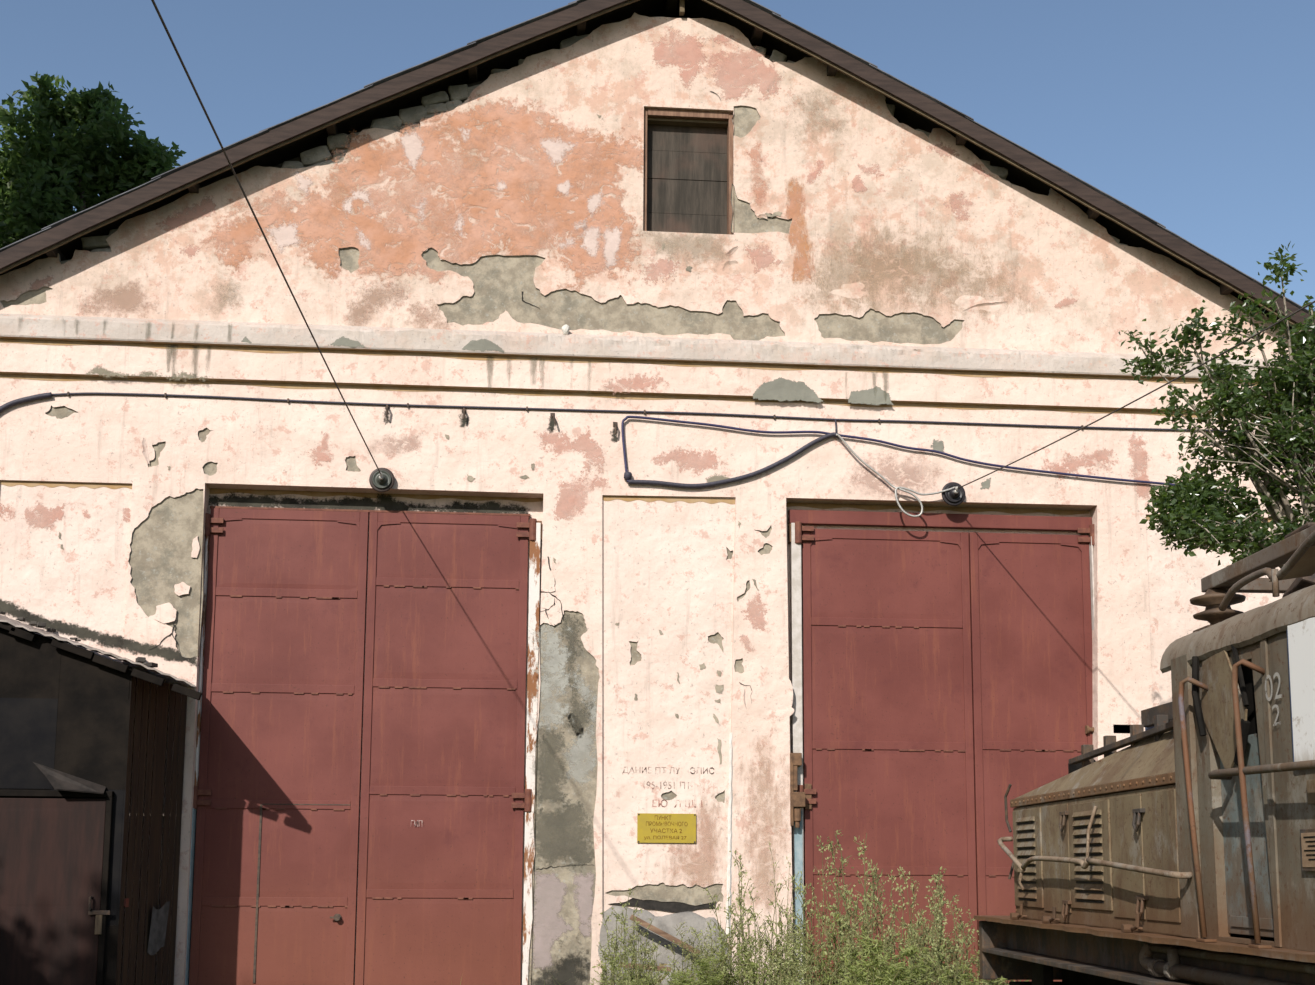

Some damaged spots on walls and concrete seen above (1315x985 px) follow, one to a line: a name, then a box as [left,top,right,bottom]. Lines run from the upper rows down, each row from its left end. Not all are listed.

peeling [652,30,792,273]
peeling [156,98,785,352]
spalling [0,276,52,307]
spalling [814,301,1008,344]
spalling [753,377,824,403]
peeling [520,430,607,520]
spalling [123,461,218,658]
spalling [738,521,773,555]
damp [0,599,199,666]
peeling [737,579,771,631]
spalling [699,632,751,764]
spalling [528,610,724,985]